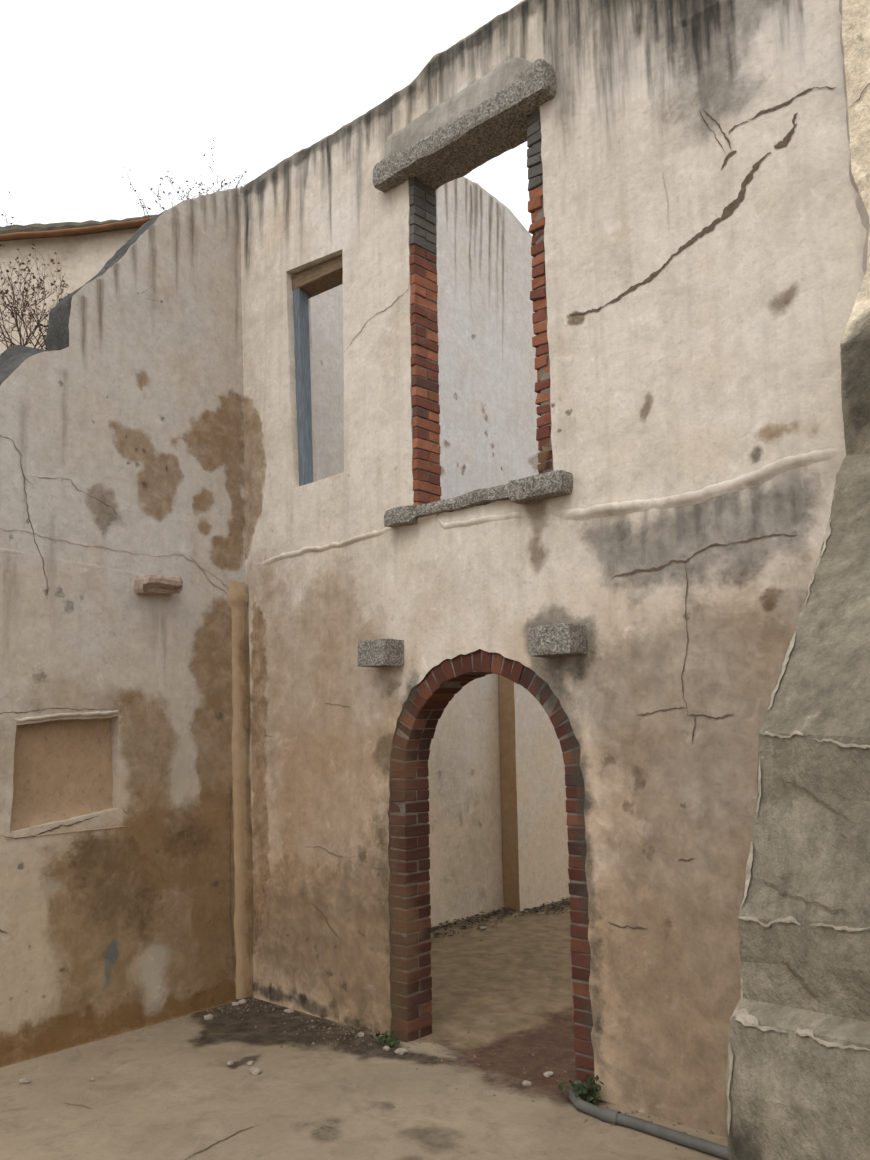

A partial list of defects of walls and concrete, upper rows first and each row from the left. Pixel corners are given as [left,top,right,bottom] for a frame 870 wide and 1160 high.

crack [569,83,870,316]
crack [0,435,229,595]
leakage [111,422,180,519]
leakage [185,394,264,569]
crack [614,534,798,743]
leakage [0,601,326,1068]